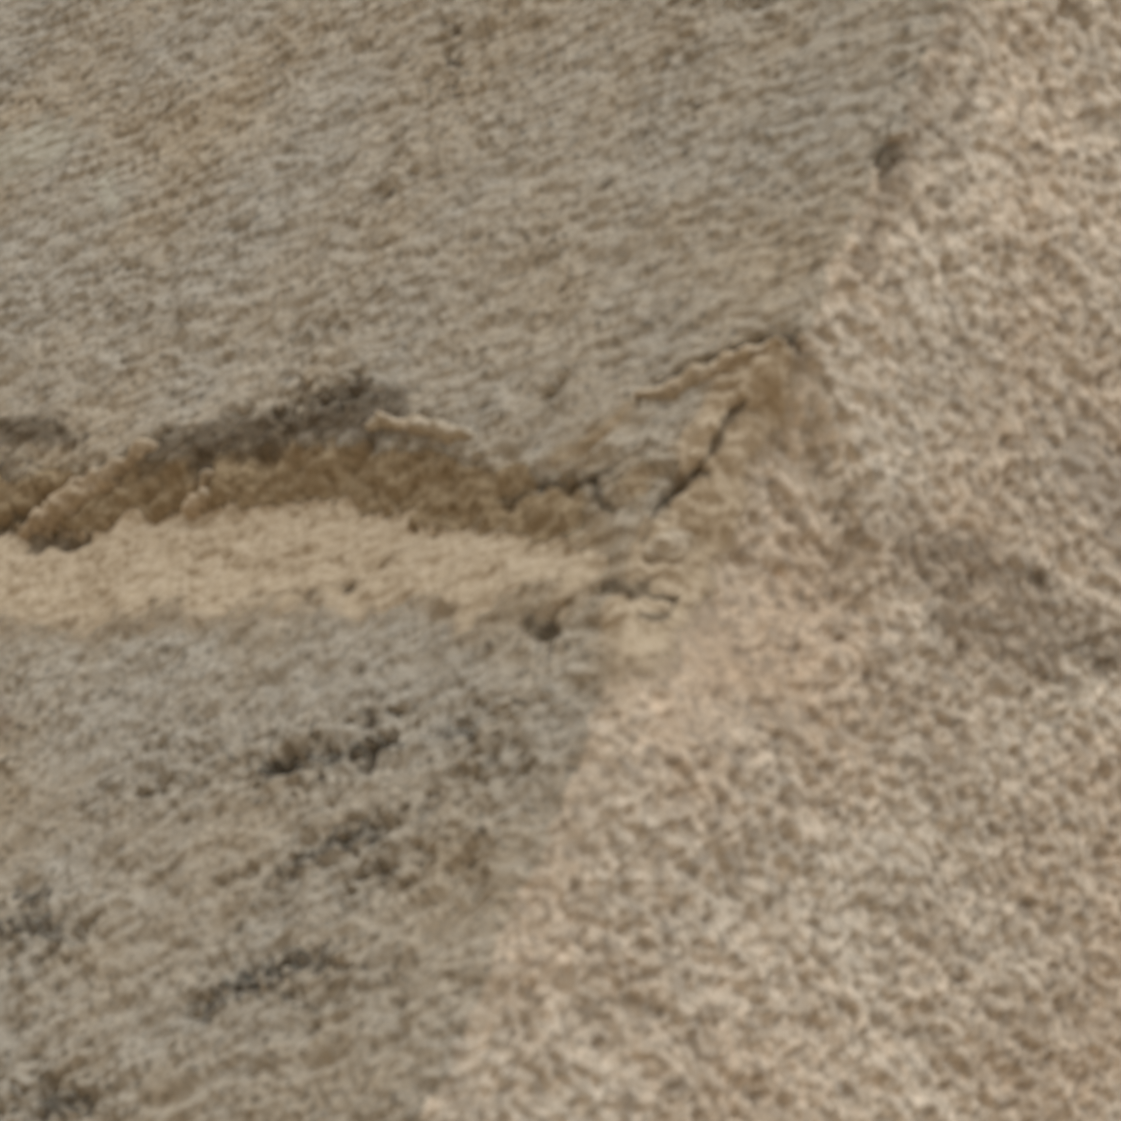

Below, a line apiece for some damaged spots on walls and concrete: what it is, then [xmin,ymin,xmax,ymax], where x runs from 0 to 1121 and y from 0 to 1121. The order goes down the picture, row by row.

crack [510,474,612,511]
crack [643,405,742,543]